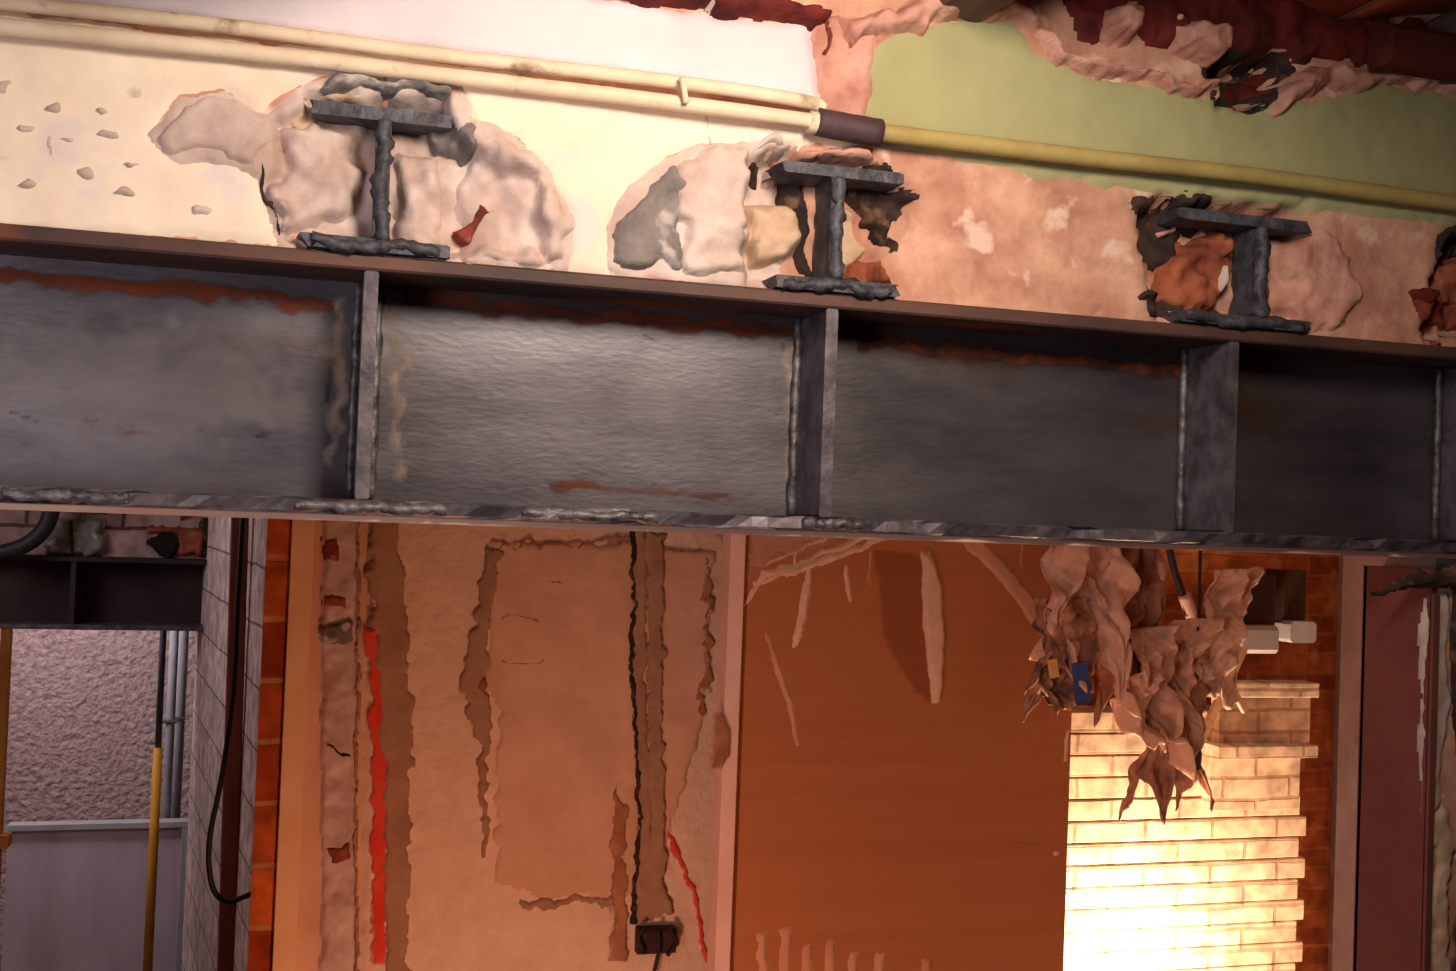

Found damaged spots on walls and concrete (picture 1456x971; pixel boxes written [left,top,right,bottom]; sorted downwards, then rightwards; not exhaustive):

spalling [96,107,119,139]
spalling [114,186,135,197]
spalling [147,72,575,271]
spalling [607,116,801,288]
flaking render [621,0,1456,117]
spalling [1127,190,1235,320]
peeling [1267,228,1364,334]
spalling [1408,226,1456,346]
rust [0,267,348,456]
rust [388,289,794,421]
rust [551,480,600,491]
peeling [1417,591,1456,971]